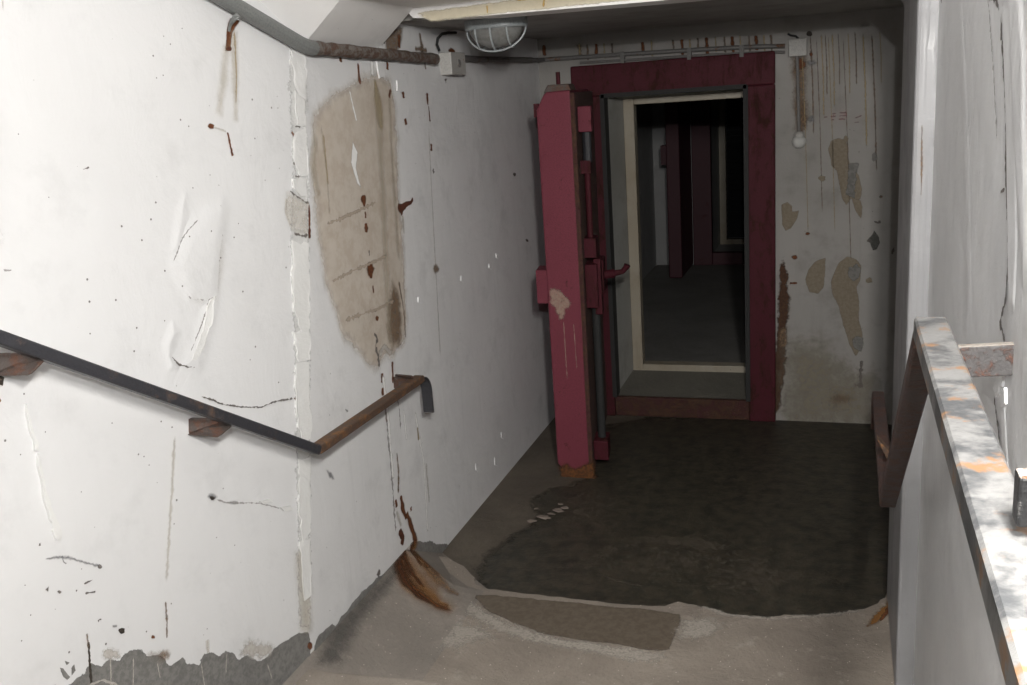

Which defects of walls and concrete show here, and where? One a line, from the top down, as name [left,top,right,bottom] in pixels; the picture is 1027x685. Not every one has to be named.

rust [357,28,402,84]
peeling [818,136,862,218]
spalling [867,221,881,250]
crack [203,397,296,408]
peeling [60,45,448,685]
rust [776,255,797,412]
peeling [805,257,872,356]
rust [395,455,459,610]